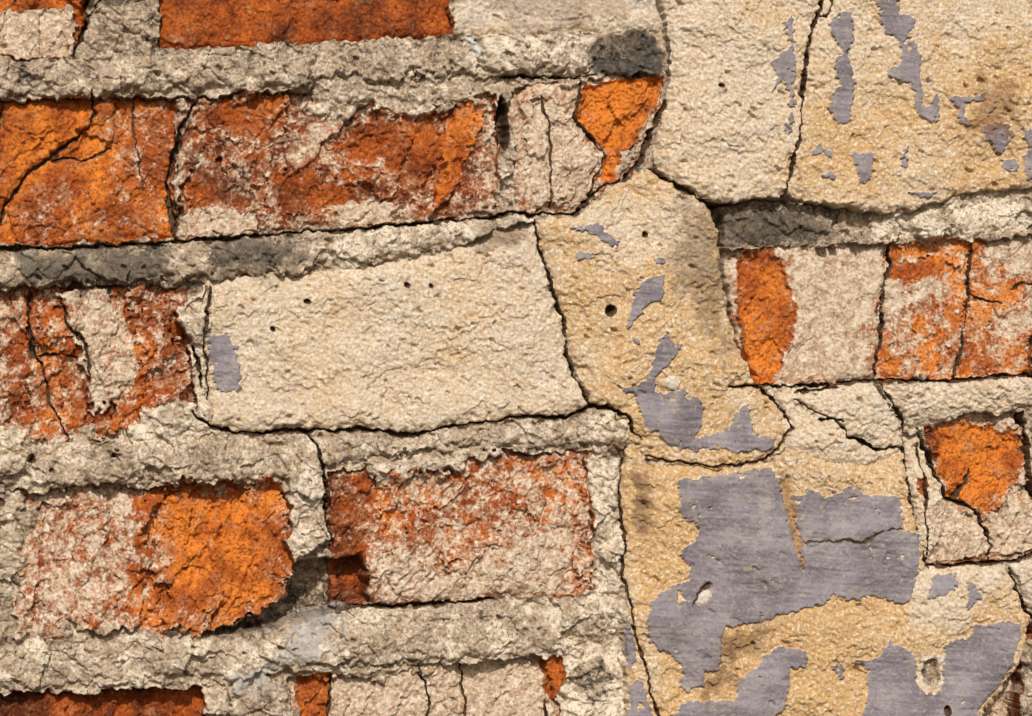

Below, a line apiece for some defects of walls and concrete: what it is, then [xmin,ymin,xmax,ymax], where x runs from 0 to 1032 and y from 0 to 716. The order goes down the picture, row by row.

crack [72,0,102,58]
spalling [181,90,484,230]
spalling [575,77,664,182]
crack [780,0,833,199]
spalling [21,286,76,443]
spalling [140,473,300,638]
crack [0,73,738,716]
spalling [735,246,800,385]
peeling [646,467,922,716]
crack [644,238,1032,619]
spalling [872,233,1031,385]
spalling [917,416,1032,555]